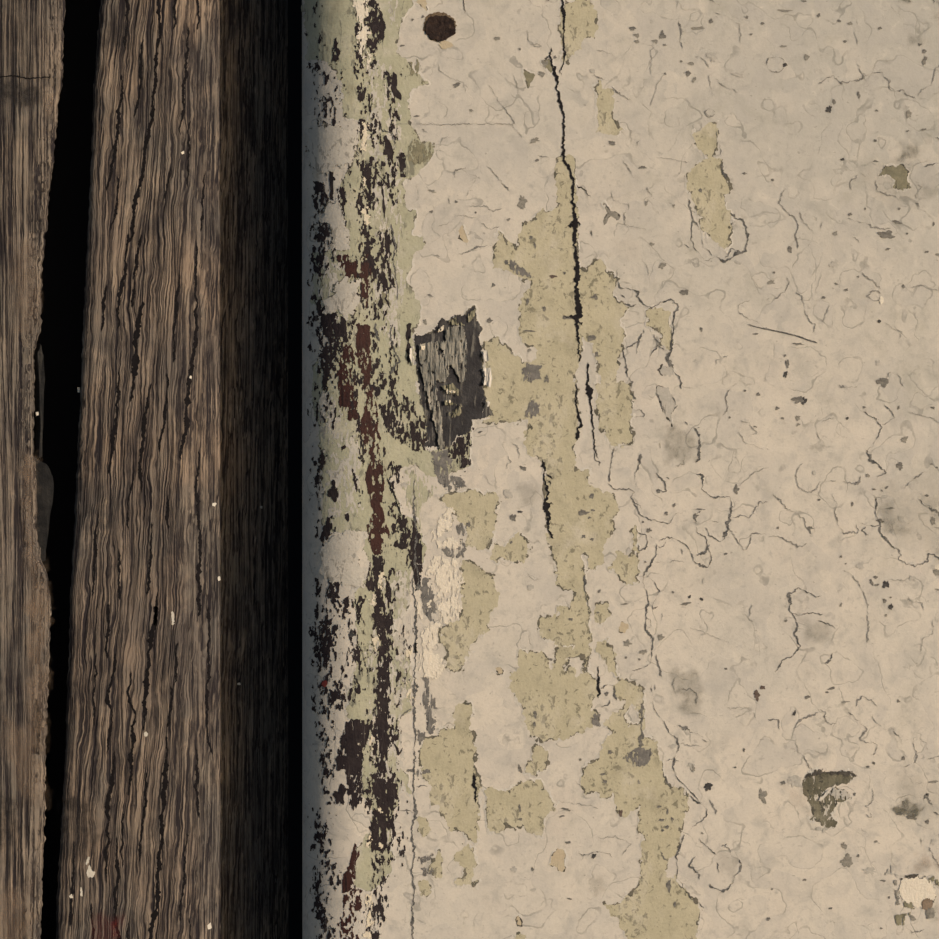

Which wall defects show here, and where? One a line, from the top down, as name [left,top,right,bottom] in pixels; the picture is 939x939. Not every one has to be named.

crack [381,75,522,146]
crack [439,167,509,253]
peeling [684,109,735,254]
crack [390,224,398,300]
peeling [301,0,702,939]
crack [527,0,939,908]
crack [387,465,427,939]
crack [470,773,478,803]
spalling [780,767,856,833]
peeling [905,876,937,921]